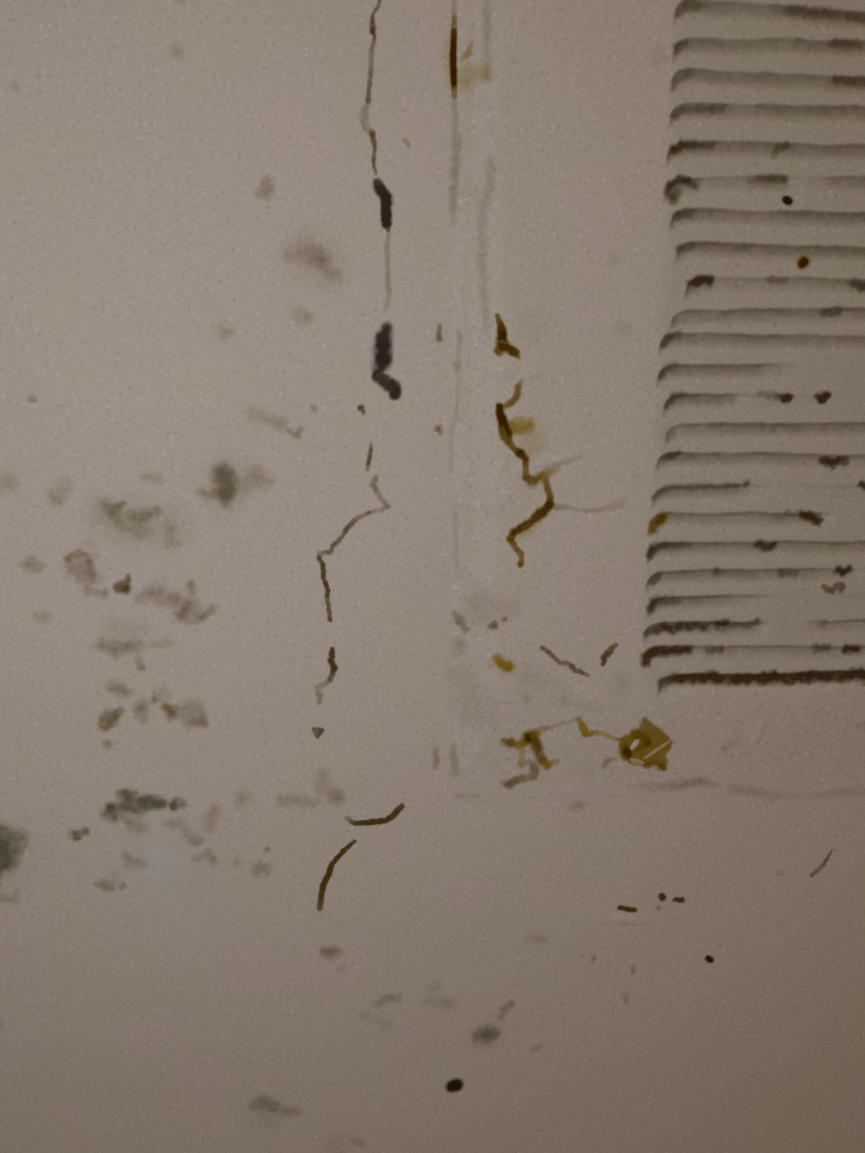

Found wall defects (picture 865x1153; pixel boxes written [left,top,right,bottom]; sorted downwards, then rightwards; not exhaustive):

crack [370,0,381,40]
crack [369,132,377,169]
crack [366,448,388,508]
crack [495,384,554,567]
crack [318,520,355,681]
crack [312,728,324,738]
rust [616,718,672,771]
mould [106,790,178,820]
mould [0,828,11,871]
crack [317,803,404,911]